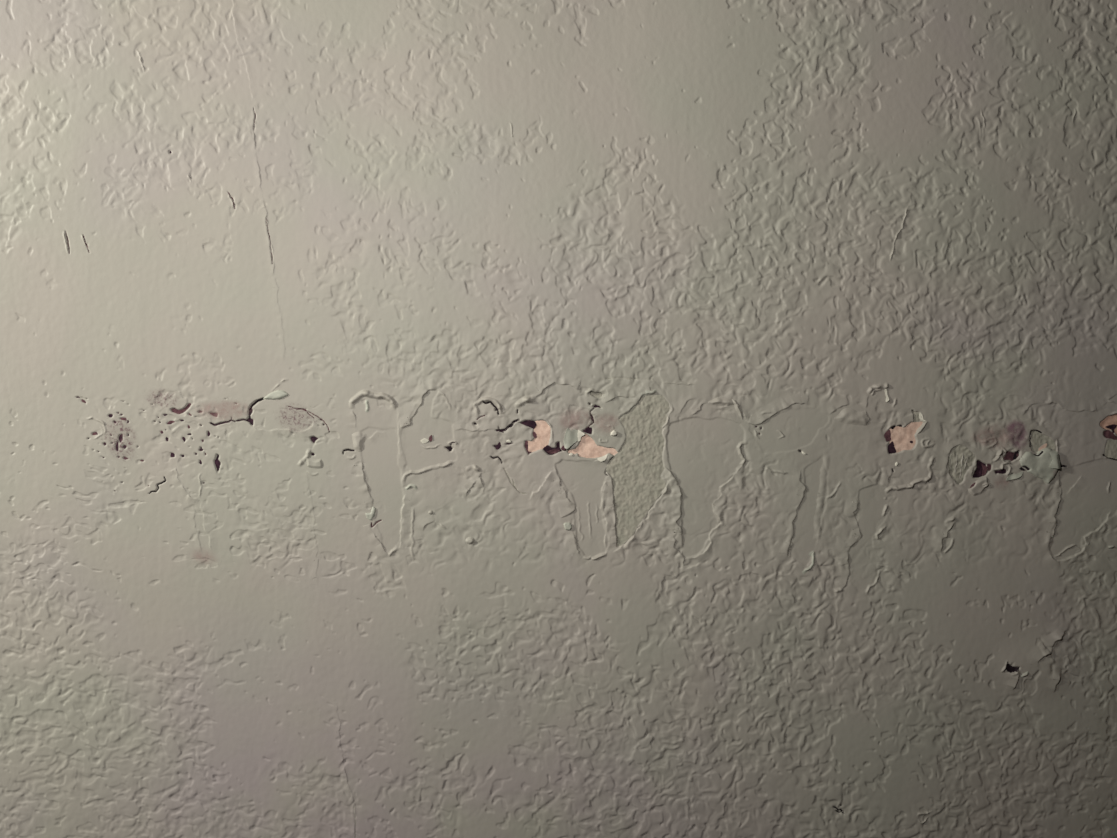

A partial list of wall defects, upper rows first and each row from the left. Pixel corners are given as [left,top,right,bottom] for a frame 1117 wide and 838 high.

crack [210,0,330,438]
peeling [347,380,457,461]
peeling [494,374,618,465]
peeling [884,410,928,454]
peeling [968,430,1067,496]
peeling [1100,400,1117,461]